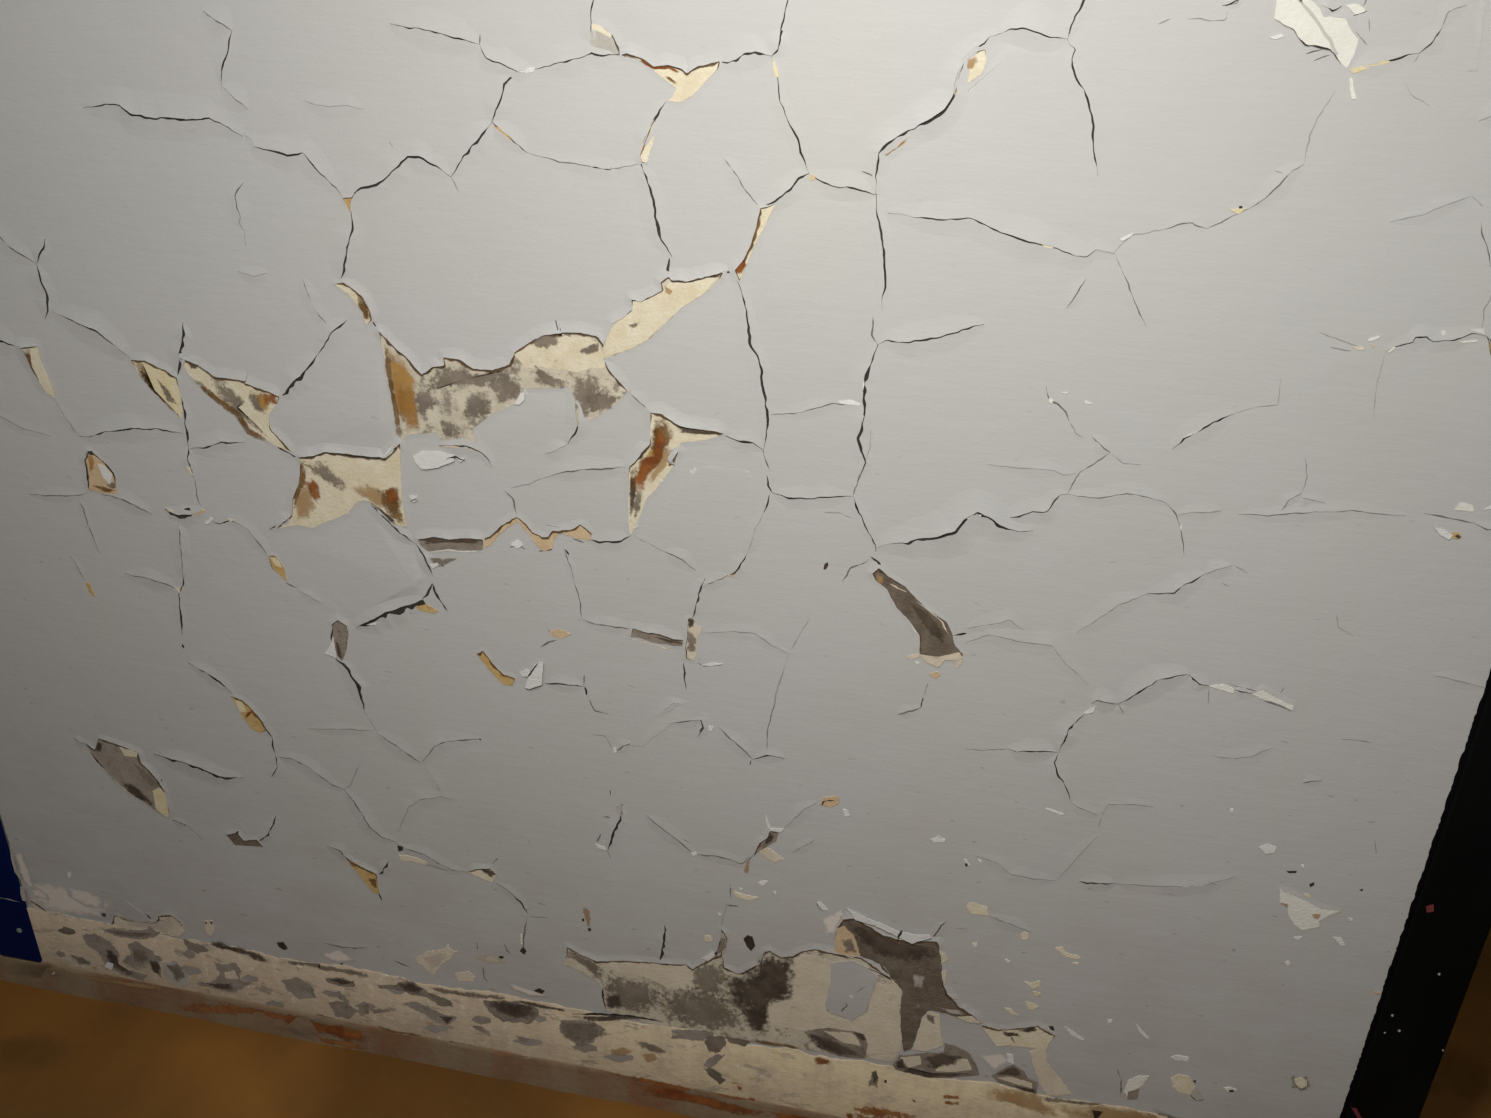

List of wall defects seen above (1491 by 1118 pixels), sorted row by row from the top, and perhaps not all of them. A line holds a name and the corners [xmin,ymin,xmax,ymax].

peeling [1270,0,1390,99]
crack [81,0,675,400]
peeling [128,200,777,689]
crack [438,387,625,488]
crack [545,0,1491,897]
crack [0,224,481,844]
peeling [864,556,967,678]
peeling [52,901,258,992]
leakage [288,961,367,976]
leakage [433,988,564,1011]
spalling [266,842,1084,1096]
leakage [743,960,795,1048]